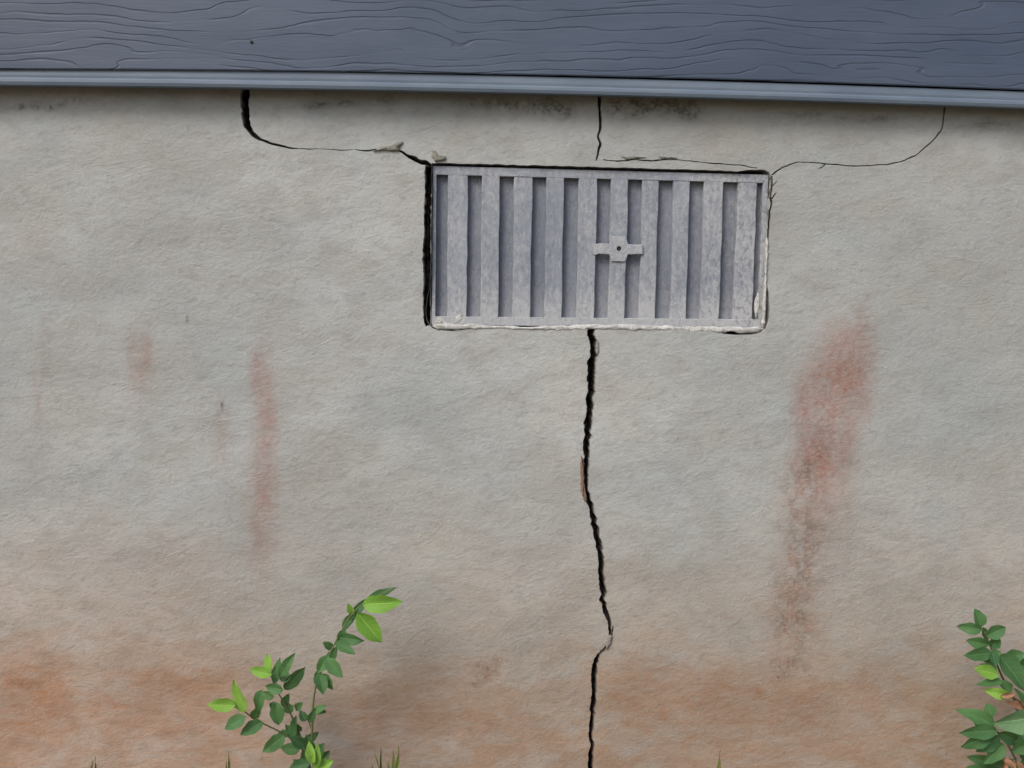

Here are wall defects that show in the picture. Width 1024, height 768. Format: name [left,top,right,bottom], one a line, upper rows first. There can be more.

crack [240,90,446,326]
crack [596,97,946,292]
crack [580,329,614,768]
rust [752,284,894,690]